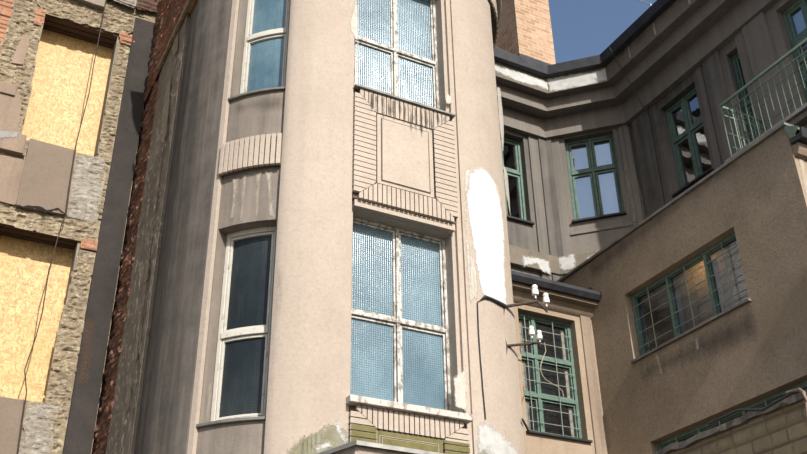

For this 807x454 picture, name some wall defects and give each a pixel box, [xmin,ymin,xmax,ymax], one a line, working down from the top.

spalling [0,0,137,454]
peeling [464,165,511,305]
peeling [522,254,576,275]
peeling [477,421,517,454]